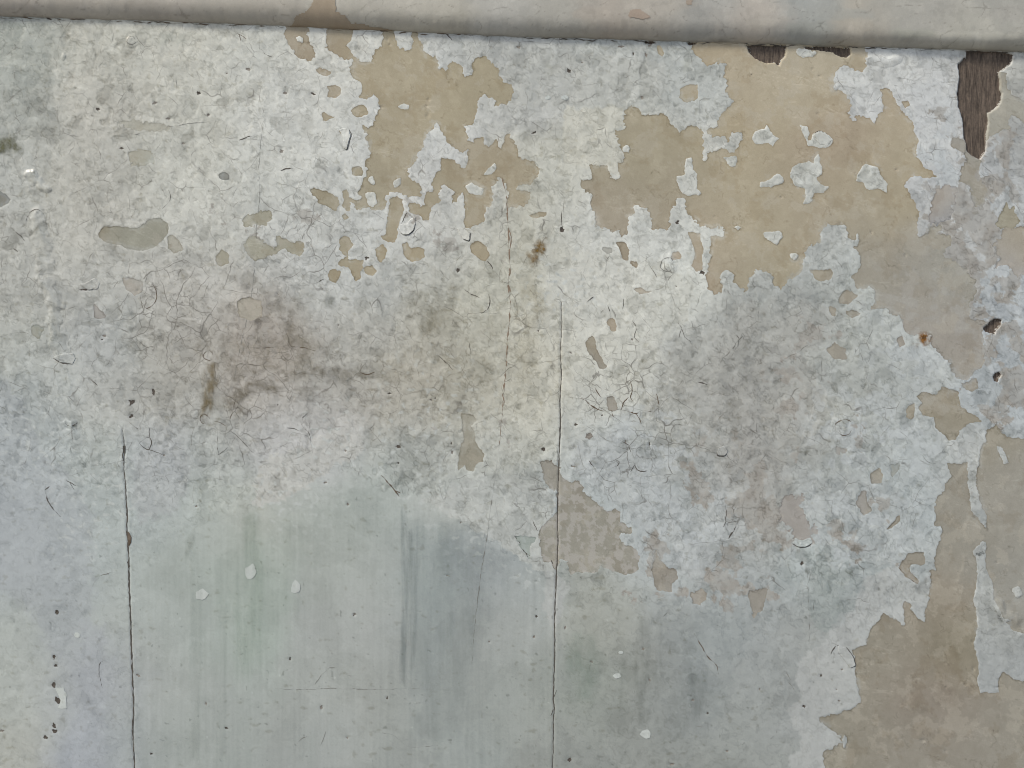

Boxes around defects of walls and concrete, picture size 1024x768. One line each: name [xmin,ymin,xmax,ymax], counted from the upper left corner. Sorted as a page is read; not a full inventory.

crack [90,428,158,768]
peeling [98,218,183,253]
peeling [284,0,547,283]
crack [516,302,659,765]
peeling [515,447,678,592]
peeling [580,42,1024,768]